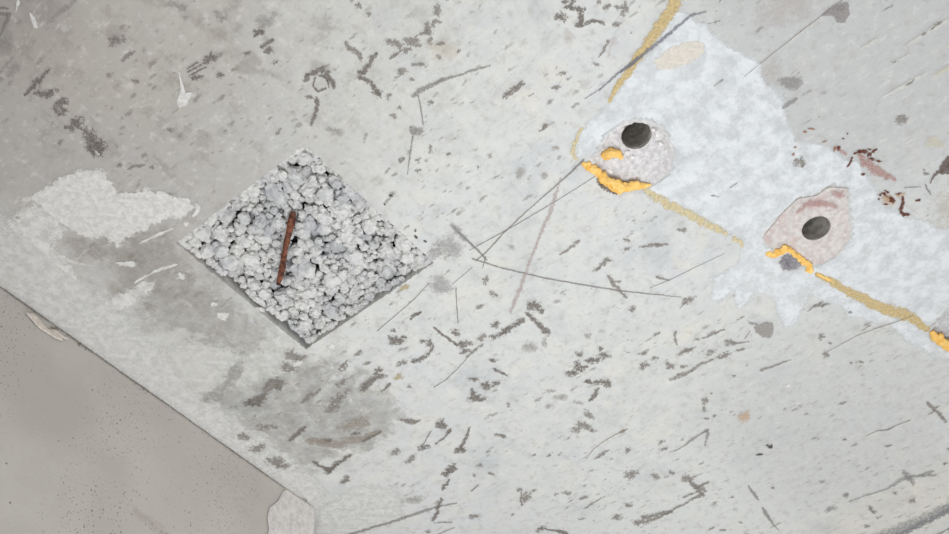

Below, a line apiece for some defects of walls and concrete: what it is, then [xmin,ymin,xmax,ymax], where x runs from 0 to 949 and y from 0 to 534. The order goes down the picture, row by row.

crack [586,12,706,98]
crack [744,0,842,77]
crack [766,187,849,233]
corrosion [796,192,844,214]
corrosion [822,133,921,217]
corrosion [276,211,296,286]
crack [826,315,913,353]